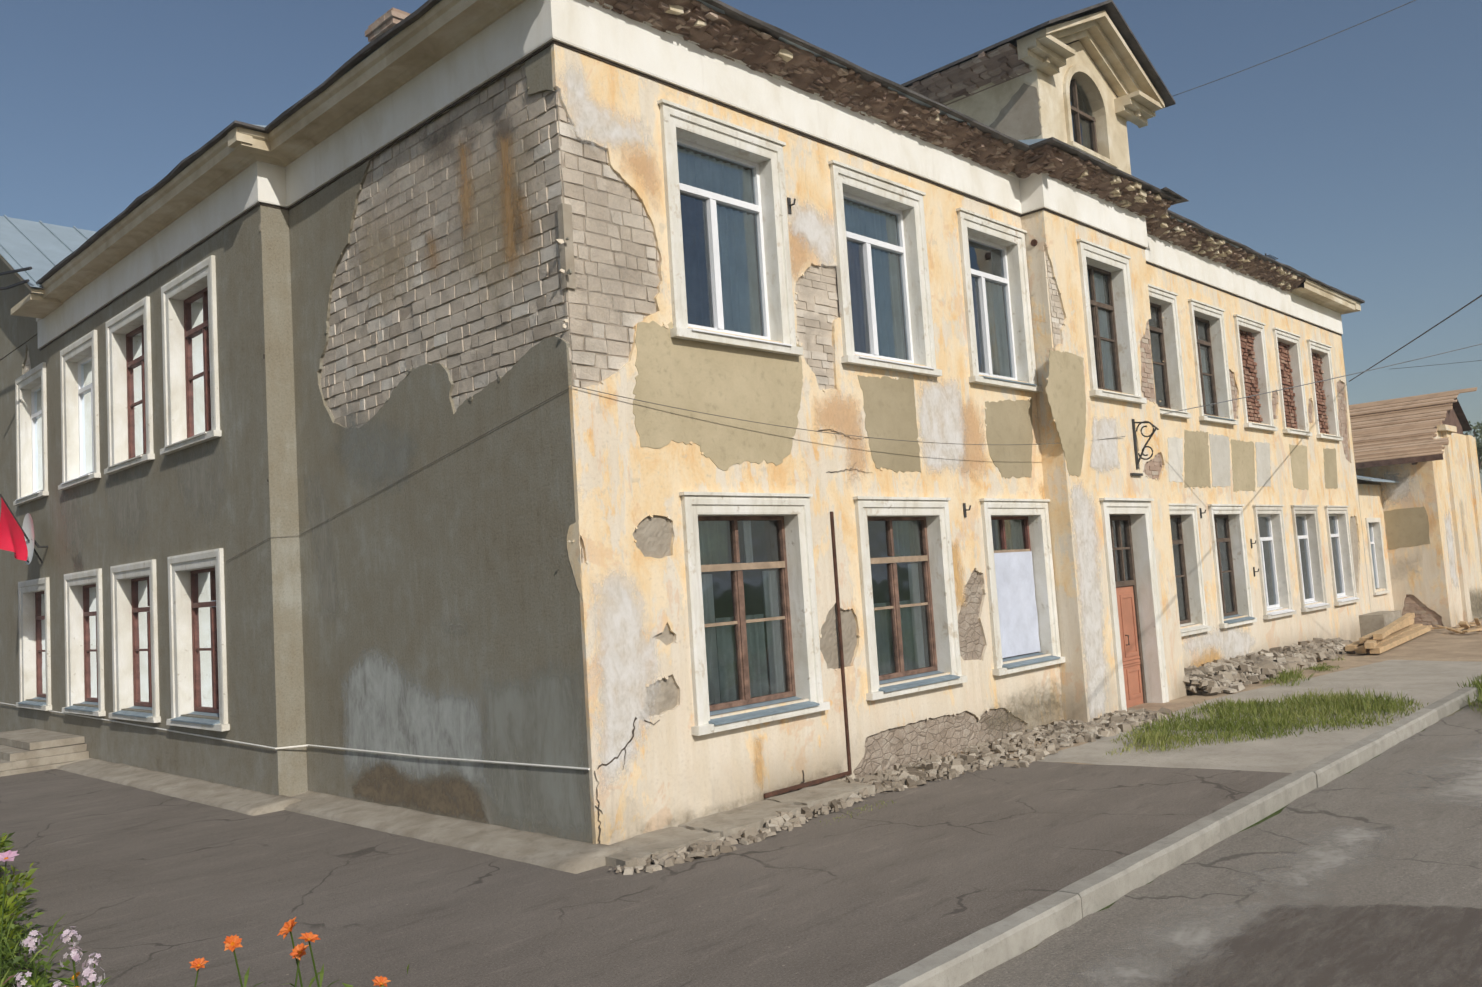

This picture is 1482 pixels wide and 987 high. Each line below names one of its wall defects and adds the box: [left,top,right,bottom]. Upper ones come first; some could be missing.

flaking render [989,83,1042,140]
flaking render [320,65,840,470]
peeling [857,375,921,473]
flaking render [633,513,672,558]
water stain [594,575,657,784]
flaking render [645,675,678,717]
flaking render [819,603,861,671]
flaking render [958,567,987,660]
water stain [346,655,584,831]
crack [594,717,660,843]
flaking render [853,708,1025,778]